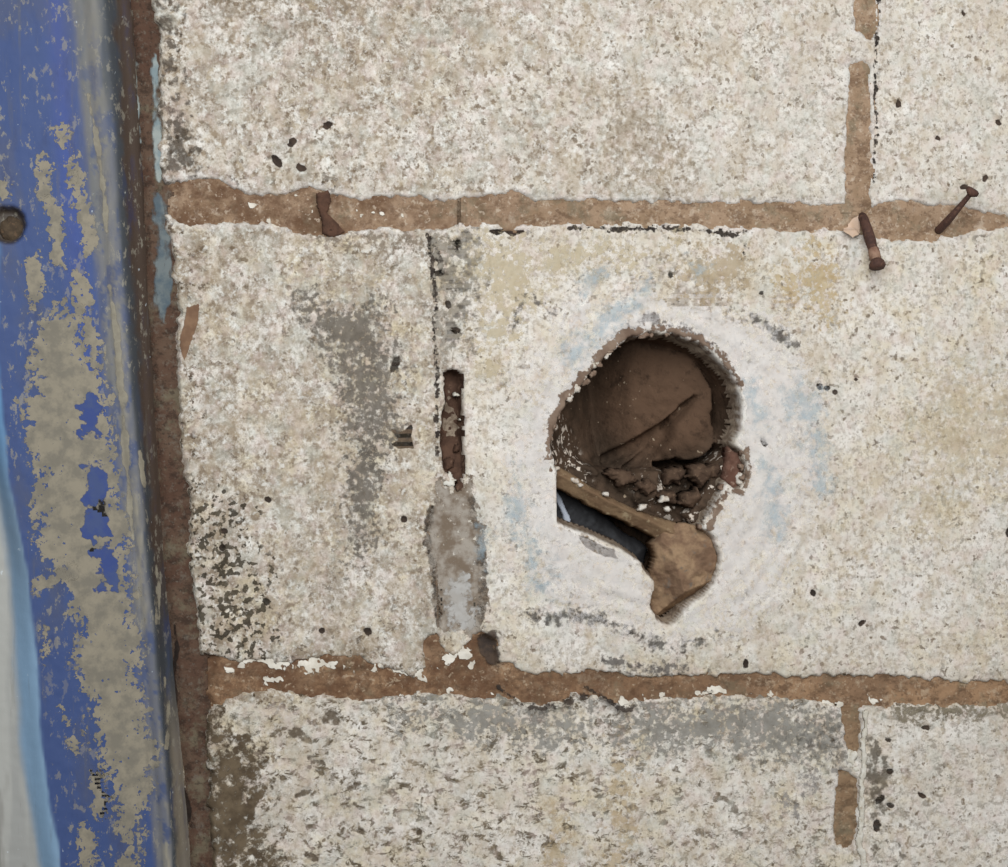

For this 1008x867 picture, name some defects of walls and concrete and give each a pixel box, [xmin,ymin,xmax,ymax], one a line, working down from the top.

peeling [0,178,13,201]
peeling [13,93,170,867]
crack [425,233,459,456]
spalling [544,323,752,568]